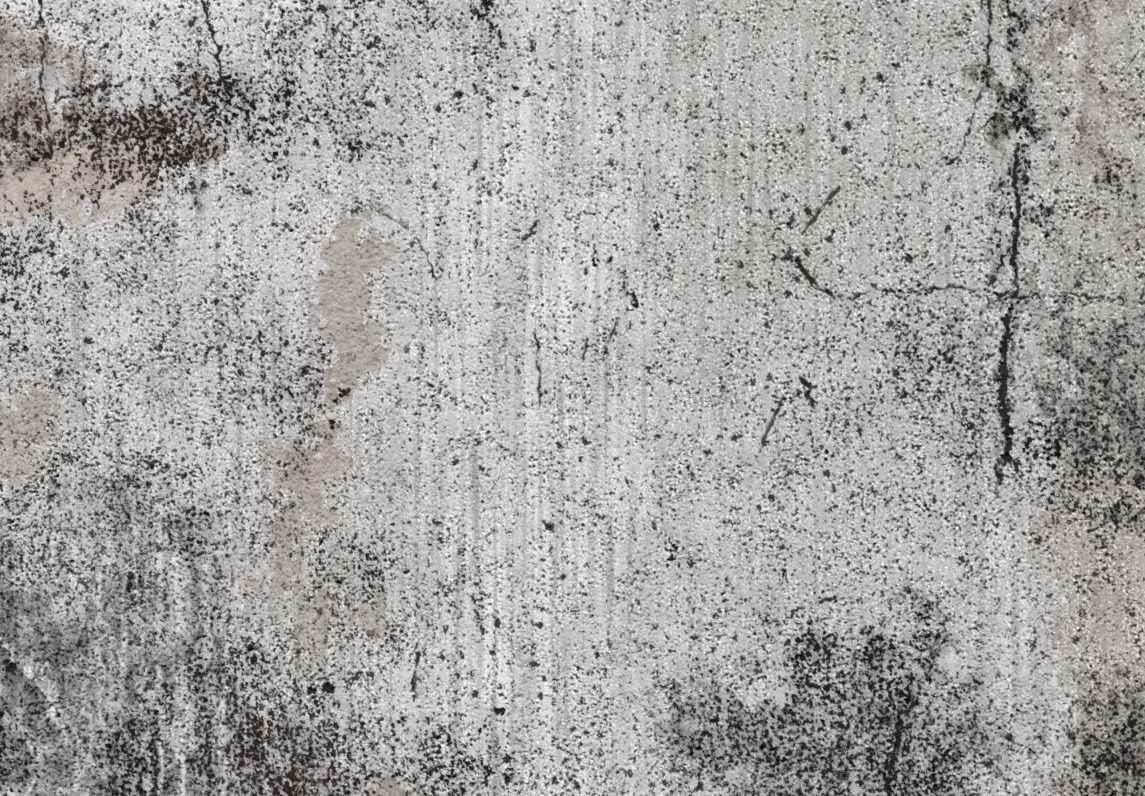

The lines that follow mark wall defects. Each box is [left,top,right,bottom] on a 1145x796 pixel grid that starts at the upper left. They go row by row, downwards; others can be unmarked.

crack [201,0,232,94]
leakage [0,0,518,370]
crack [921,0,993,193]
leakage [140,273,332,482]
leakage [336,407,402,504]
crack [771,142,1145,485]
leakage [0,426,528,796]
leakage [629,545,1145,796]